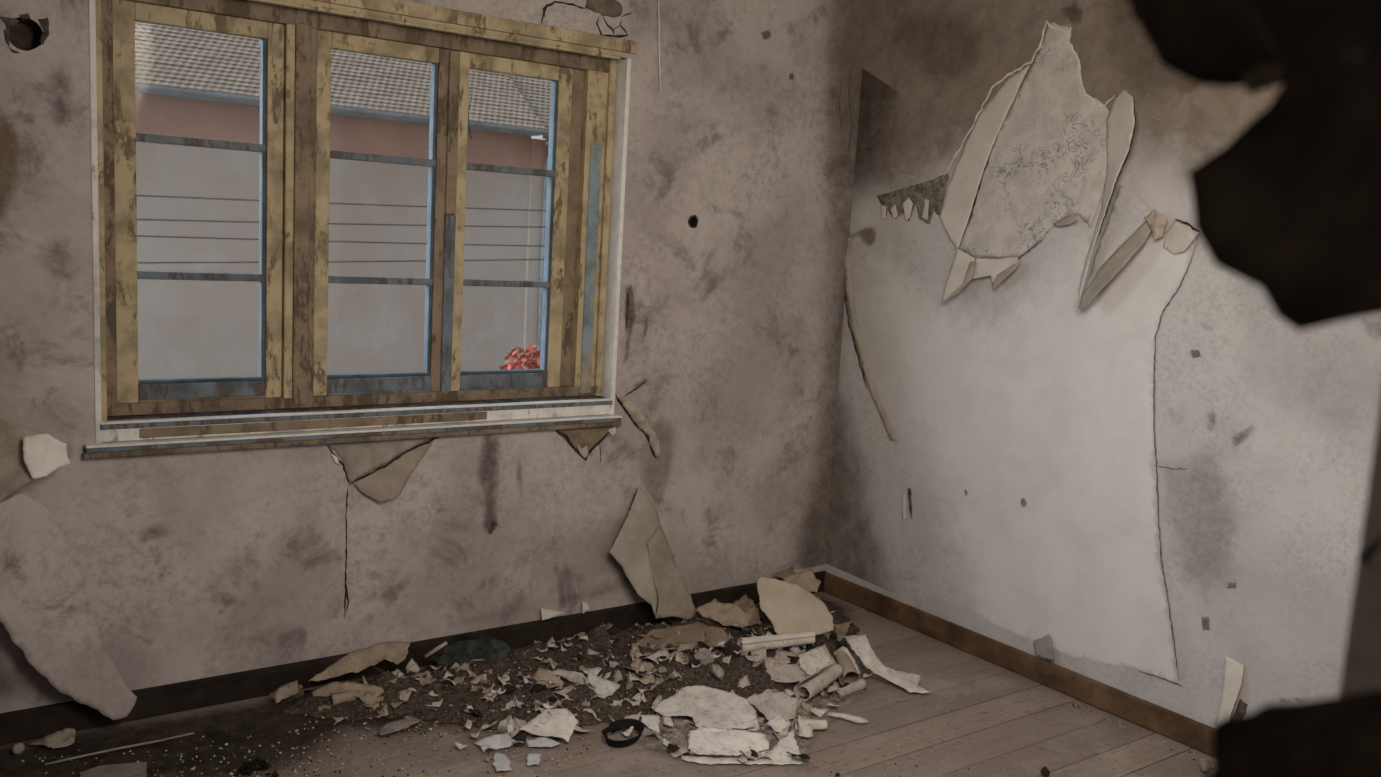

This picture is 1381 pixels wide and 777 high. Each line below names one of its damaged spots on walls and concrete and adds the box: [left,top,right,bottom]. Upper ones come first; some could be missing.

spalling [0,13,49,53]
spalling [585,0,622,18]
peeling [850,20,1199,686]
crack [342,490,350,618]